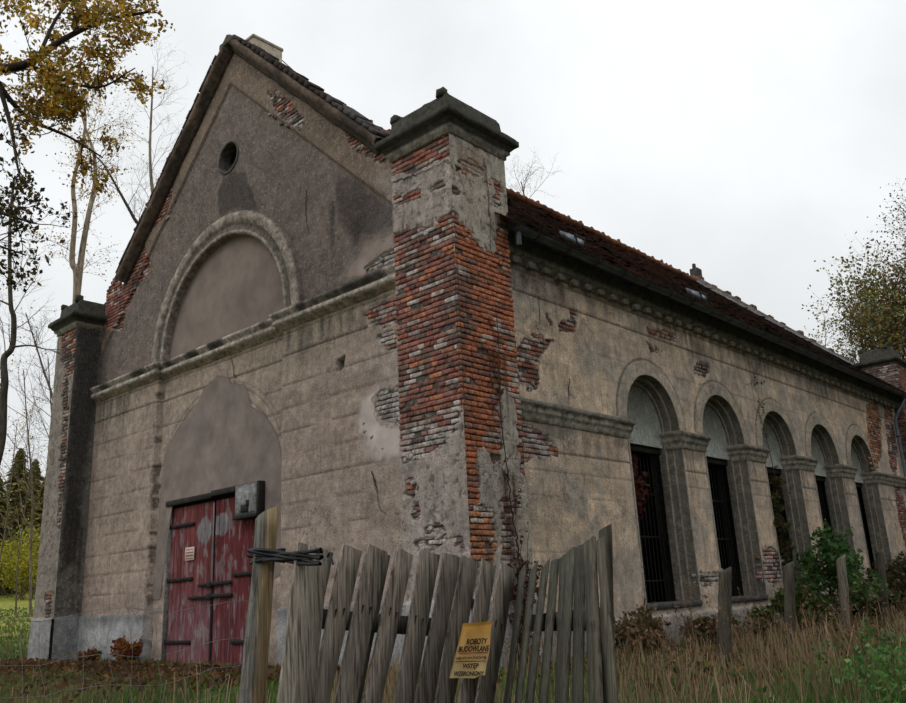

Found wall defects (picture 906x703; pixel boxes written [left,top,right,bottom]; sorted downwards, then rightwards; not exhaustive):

flaking render [267,90,305,130]
flaking render [105,246,151,334]
flaking render [337,133,577,566]
flaking render [55,328,77,529]
flaking render [866,401,898,475]
flaking render [894,487,906,548]
flaking render [755,546,785,586]